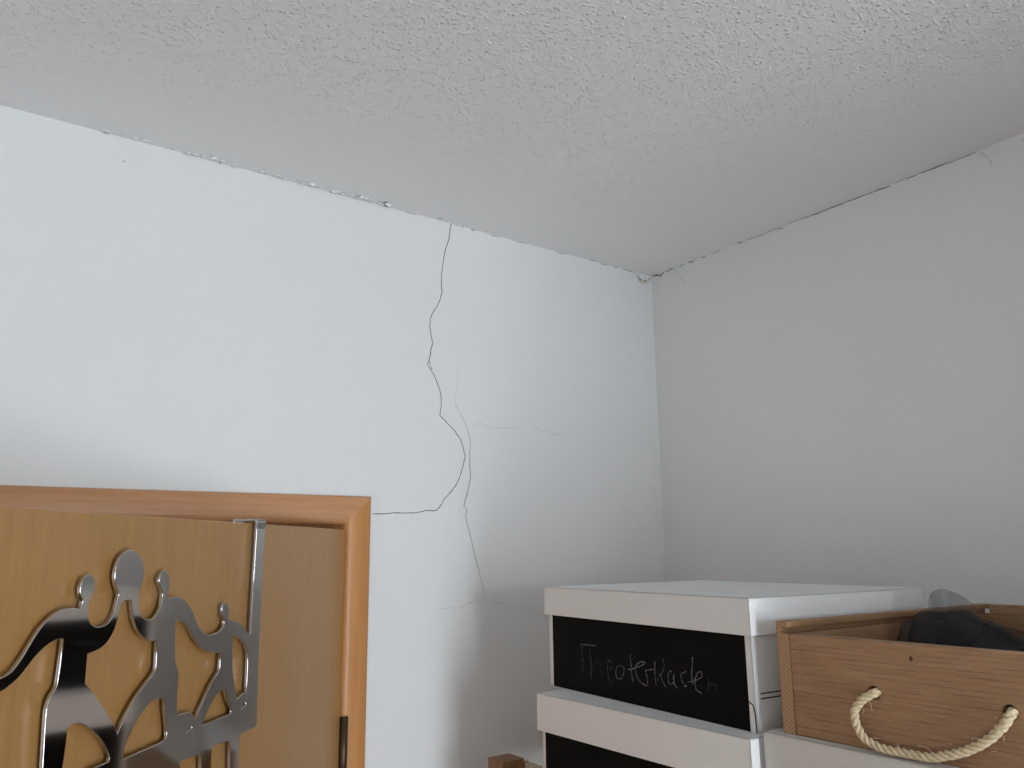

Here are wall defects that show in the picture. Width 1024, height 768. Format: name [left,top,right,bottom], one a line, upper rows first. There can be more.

crack [652,152,976,277]
crack [374,224,477,562]